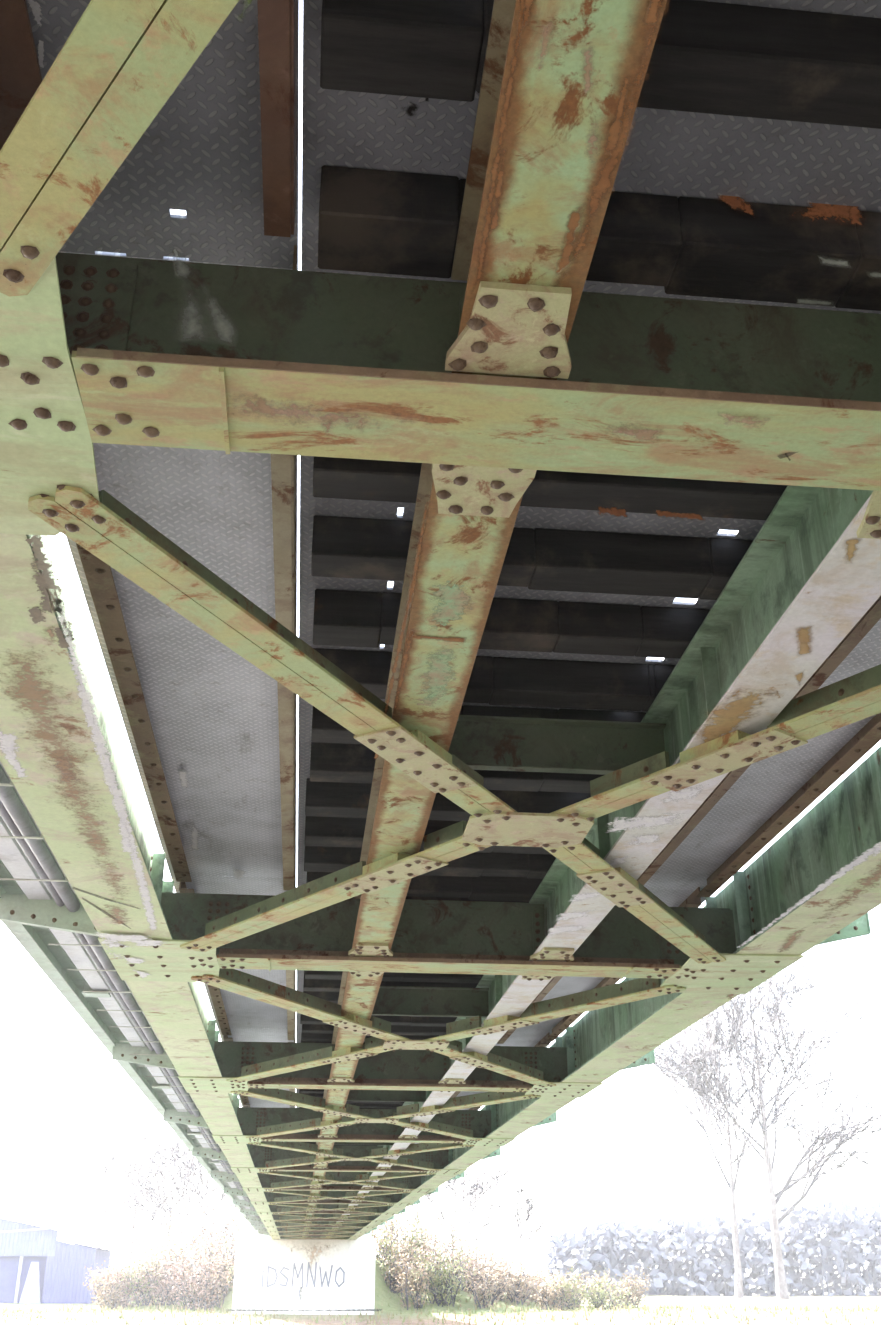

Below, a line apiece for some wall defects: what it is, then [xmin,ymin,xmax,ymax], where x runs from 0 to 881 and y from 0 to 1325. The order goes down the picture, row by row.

corrosion [556,0,666,277]
corrosion [720,195,753,215]
corrosion [802,203,862,225]
corrosion [384,502,464,715]
corrosion [6,652,125,891]